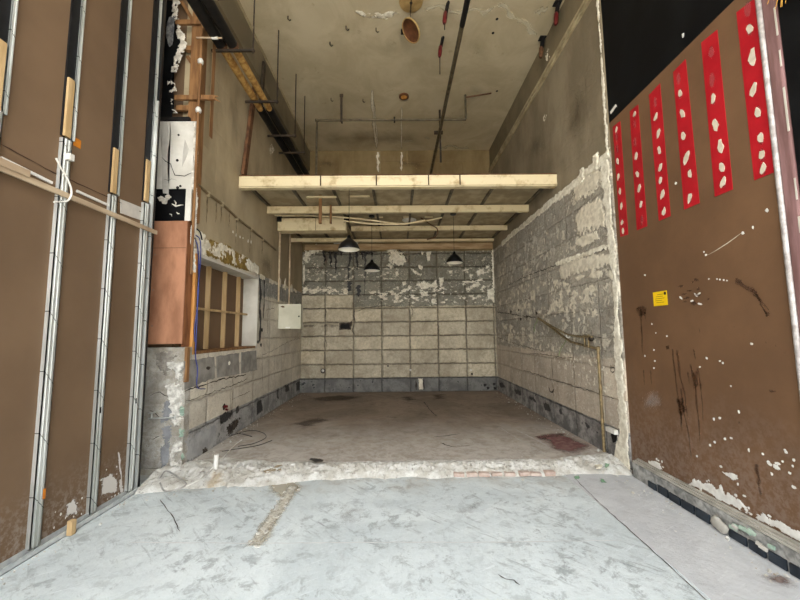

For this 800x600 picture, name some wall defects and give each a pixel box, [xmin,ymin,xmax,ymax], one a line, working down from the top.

peeling [355,11,395,20]
peeling [260,244,368,295]
water stain [322,251,377,295]
peeling [368,0,630,470]
peeling [155,349,257,468]
peeling [689,465,800,541]